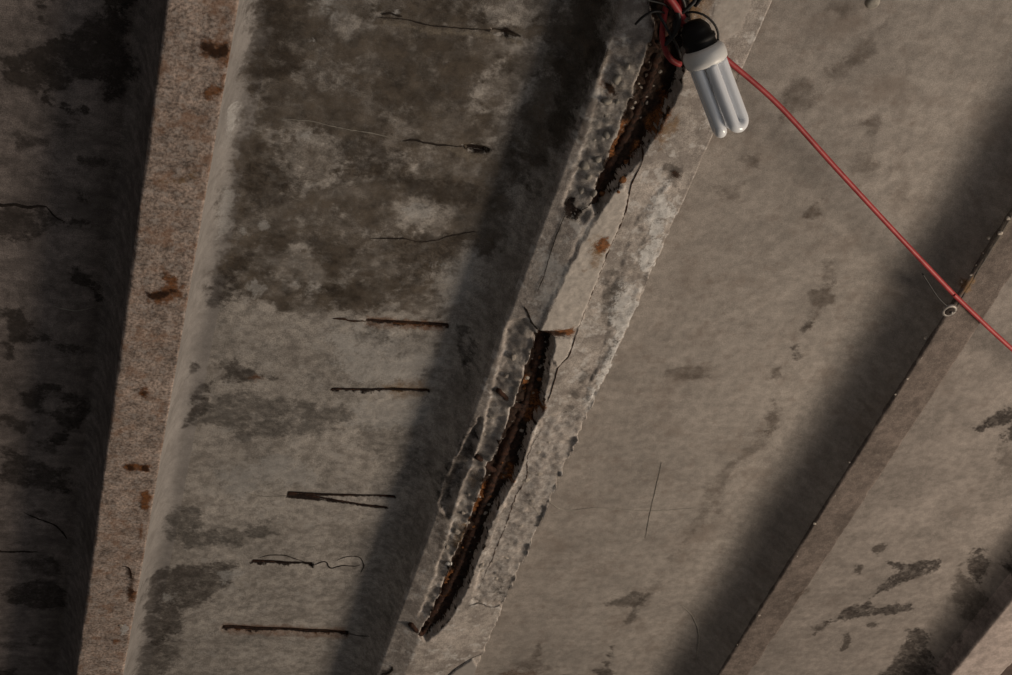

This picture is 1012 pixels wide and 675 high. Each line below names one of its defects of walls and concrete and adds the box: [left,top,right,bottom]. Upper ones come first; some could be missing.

damp [0,0,140,114]
corrosion [200,43,230,65]
damp [216,0,616,319]
crack [0,203,65,241]
corrosion [146,273,186,303]
spalling [408,0,699,639]
corrosion [544,329,575,337]
damp [184,362,347,442]
damp [972,407,1012,440]
damp [143,563,236,644]
damp [813,560,941,636]
damp [882,628,934,675]